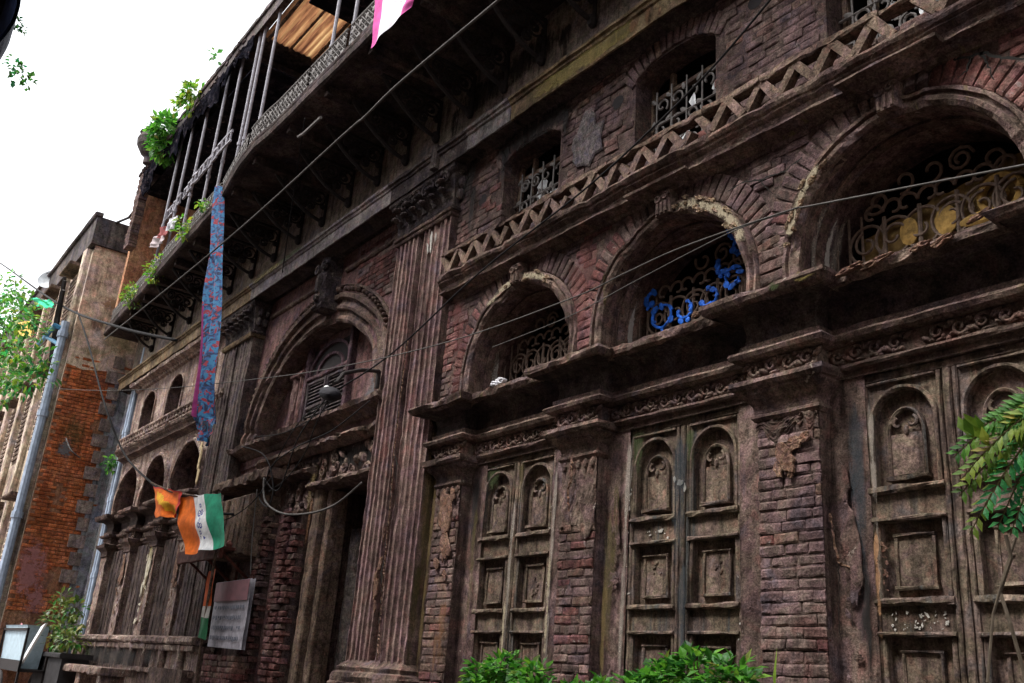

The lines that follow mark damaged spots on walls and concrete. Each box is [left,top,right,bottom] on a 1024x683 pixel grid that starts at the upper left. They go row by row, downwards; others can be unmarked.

flaking render [671,194,744,241]
spalling [773,431,810,479]
flaking render [433,488,455,581]
flaking render [837,461,863,619]